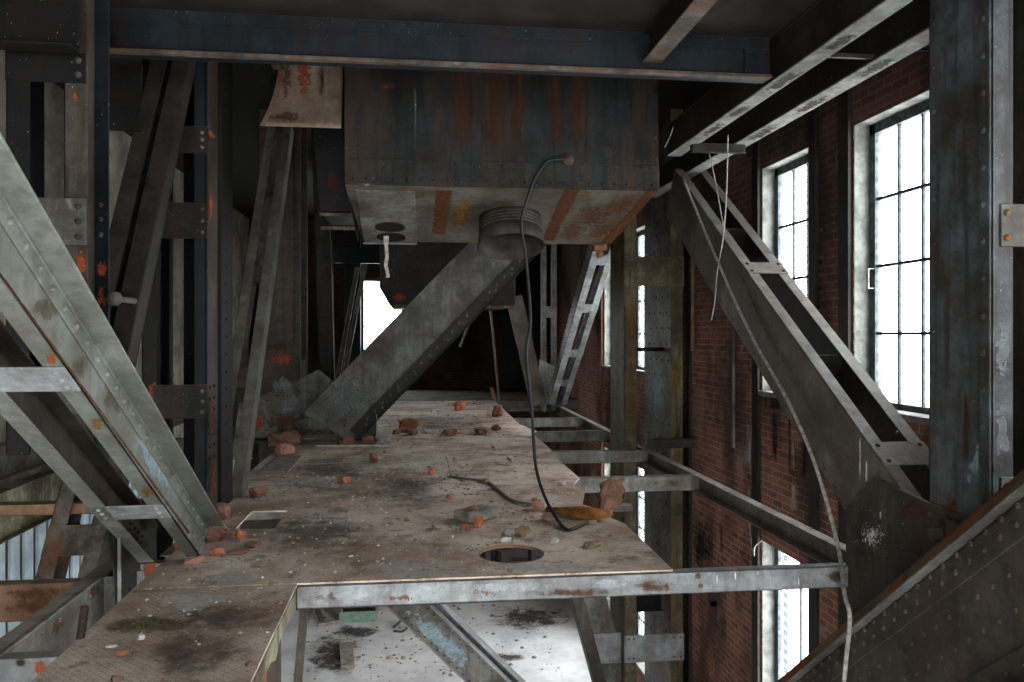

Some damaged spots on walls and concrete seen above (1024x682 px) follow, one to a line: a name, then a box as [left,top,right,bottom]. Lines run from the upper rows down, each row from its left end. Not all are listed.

rust [281,65,324,97]
rust [269,112,299,121]
rust [415,185,470,234]
rust [544,190,658,244]
rust [6,589,58,613]
rust [539,589,604,597]
rust [639,582,669,591]